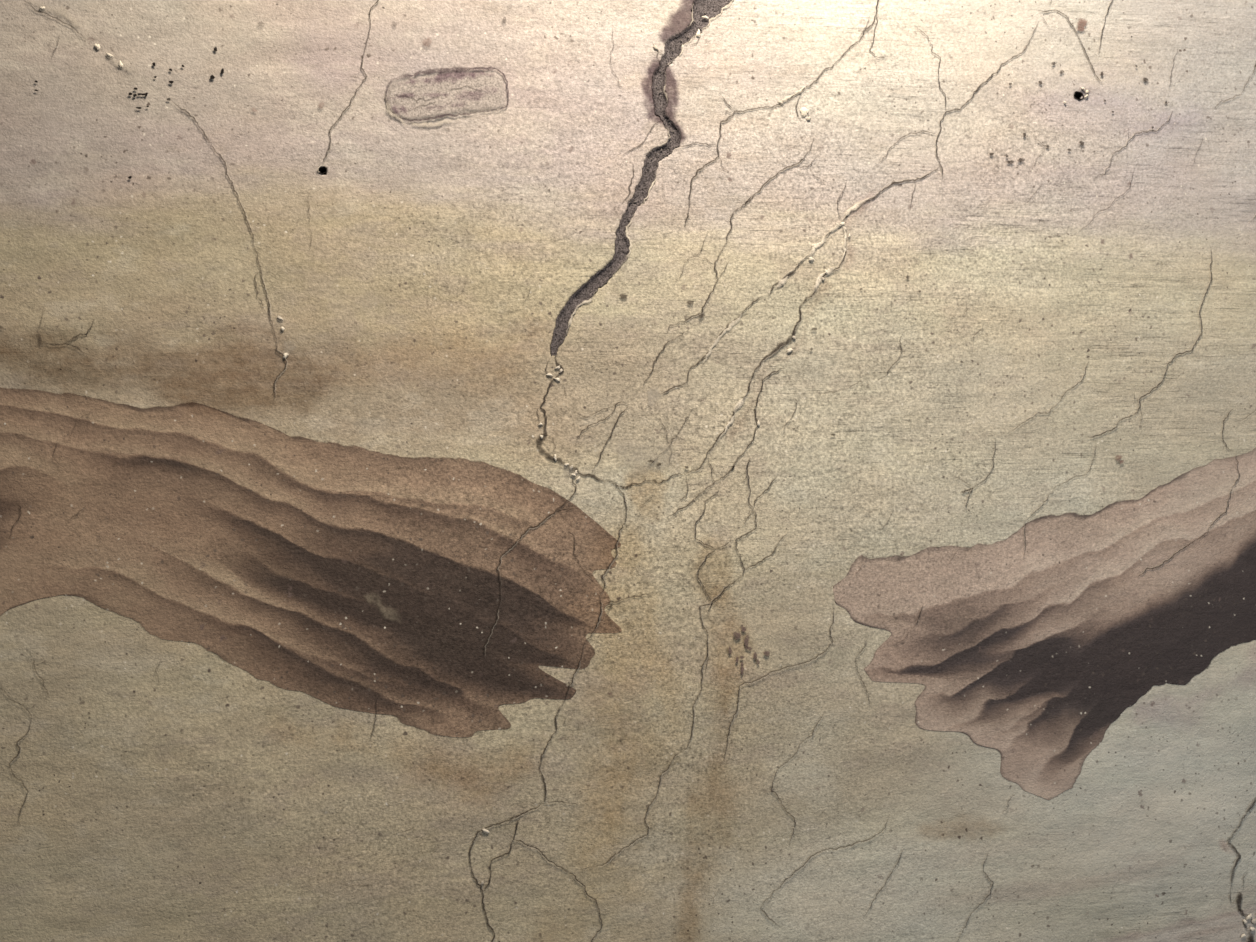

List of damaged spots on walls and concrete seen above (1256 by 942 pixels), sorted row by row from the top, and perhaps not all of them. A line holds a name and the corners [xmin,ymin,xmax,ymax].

crack [323,0,379,160]
crack [176,105,289,393]
crack [1086,116,1171,227]
crack [38,326,92,353]
crack [469,0,1113,942]
crack [1024,252,1212,550]
crack [1143,411,1249,574]
crack [1228,800,1256,942]